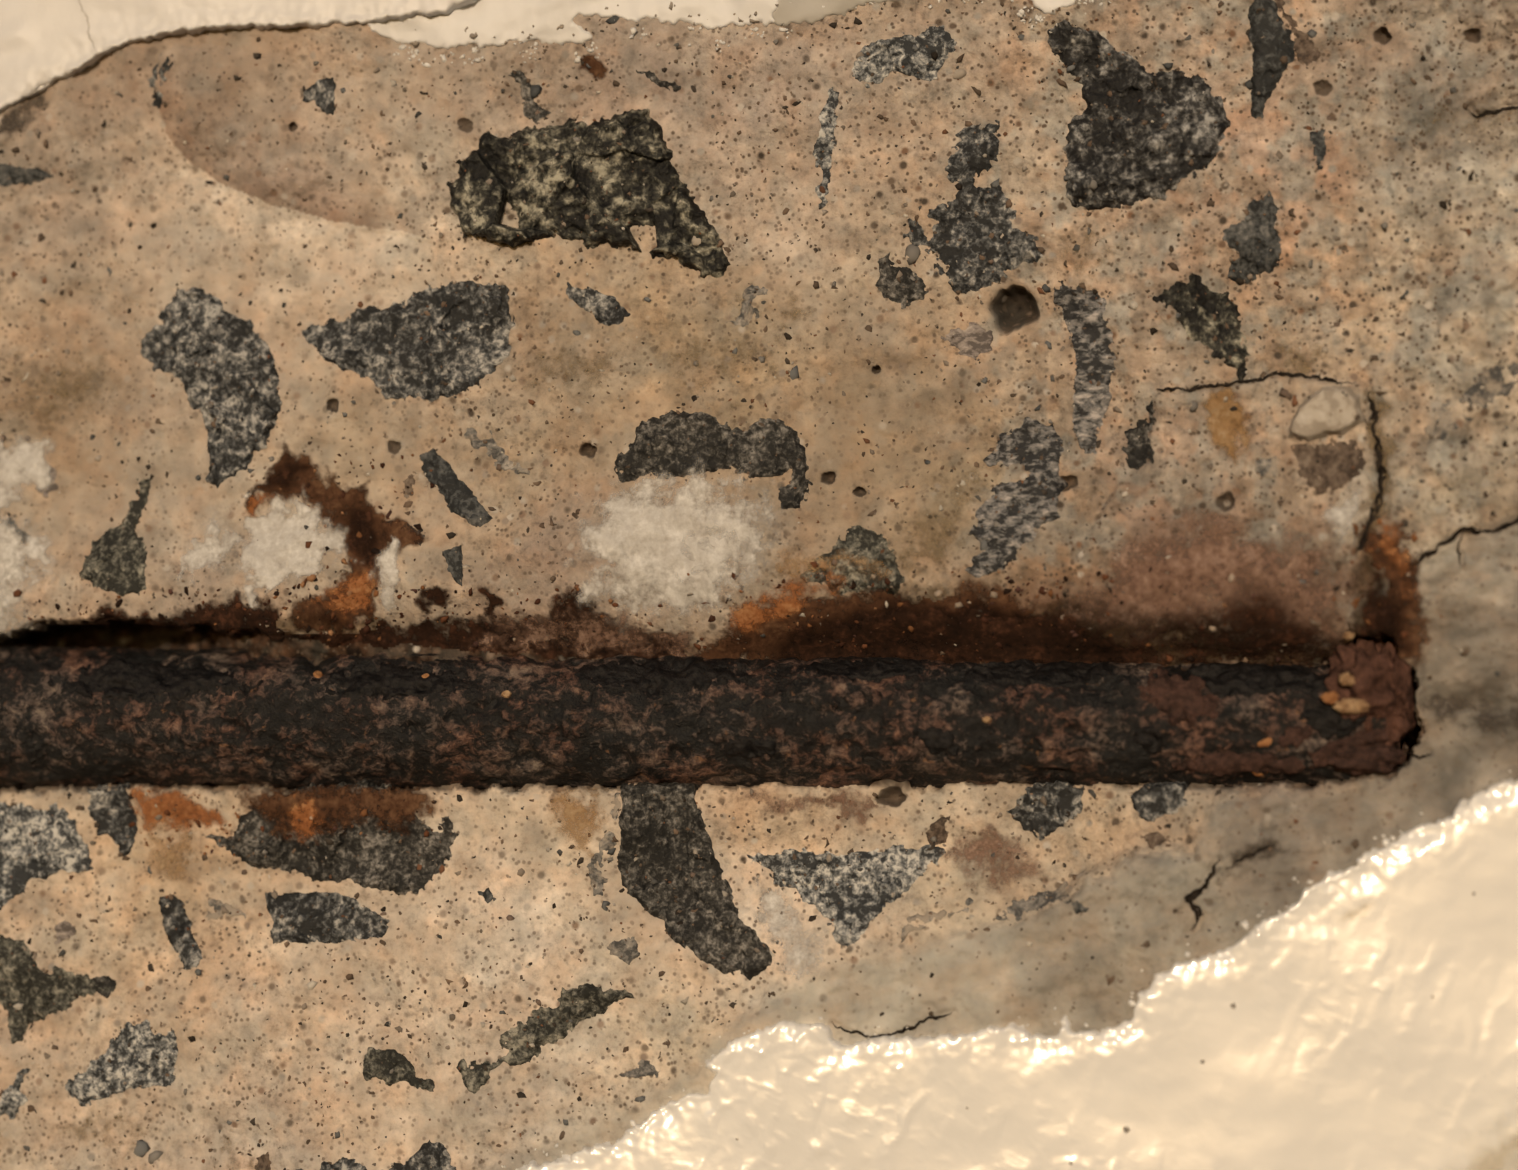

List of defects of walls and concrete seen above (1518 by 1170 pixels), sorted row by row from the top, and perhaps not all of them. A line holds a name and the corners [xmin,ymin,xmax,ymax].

spalling [0,0,1518,667]
crack [1156,370,1387,556]
leakage [0,440,52,641]
leakage [179,497,344,607]
leakage [377,539,399,609]
leakage [580,470,772,615]
crack [1411,517,1518,566]
rust [1257,737,1272,747]
spalling [1401,689,1422,766]
spalling [0,770,1518,1170]